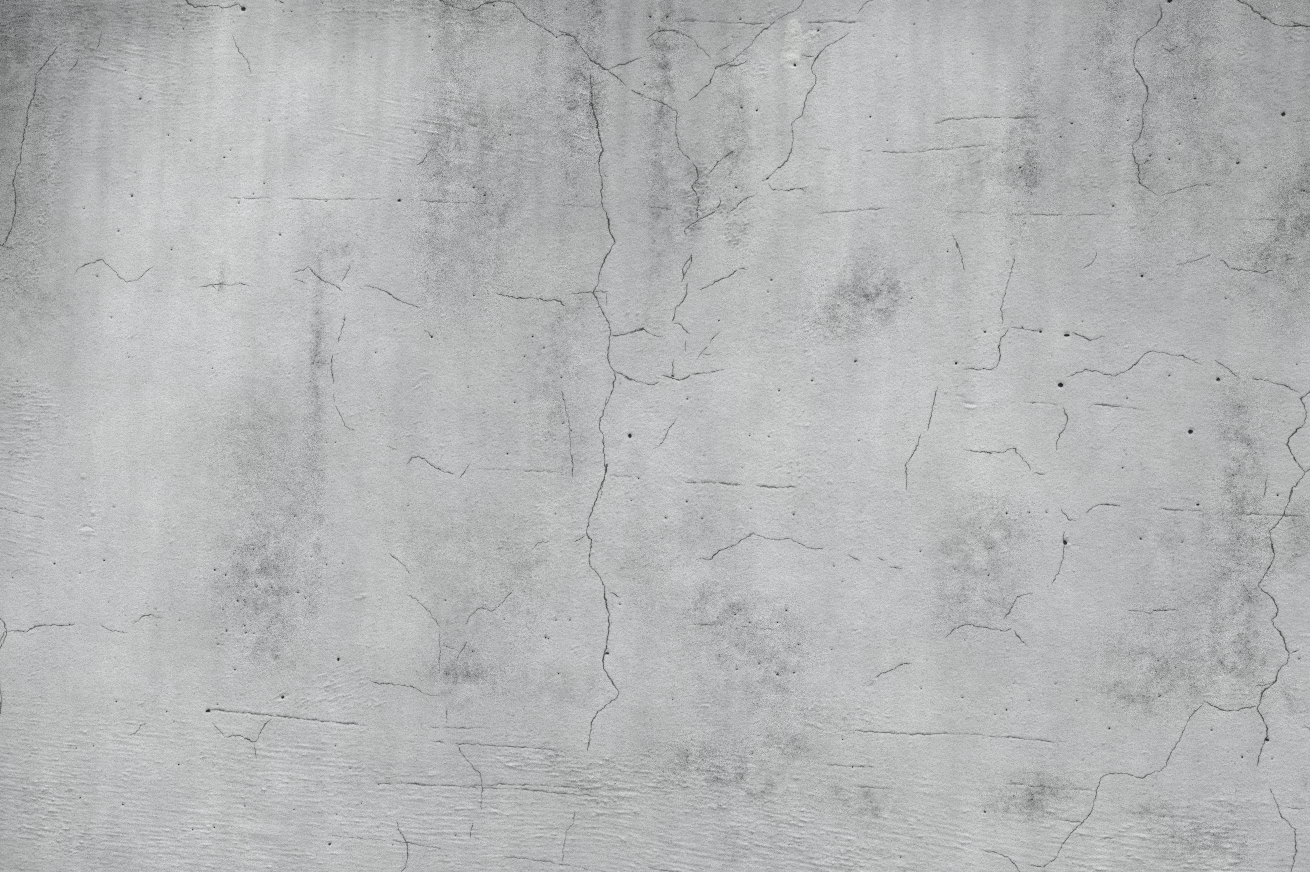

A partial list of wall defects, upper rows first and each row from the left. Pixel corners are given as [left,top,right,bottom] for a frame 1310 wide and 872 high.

crack [1132,3,1208,196]
crack [1238,0,1310,27]
crack [440,0,872,751]
crack [968,256,1038,370]
crack [946,504,1119,643]
crack [981,332,1310,872]